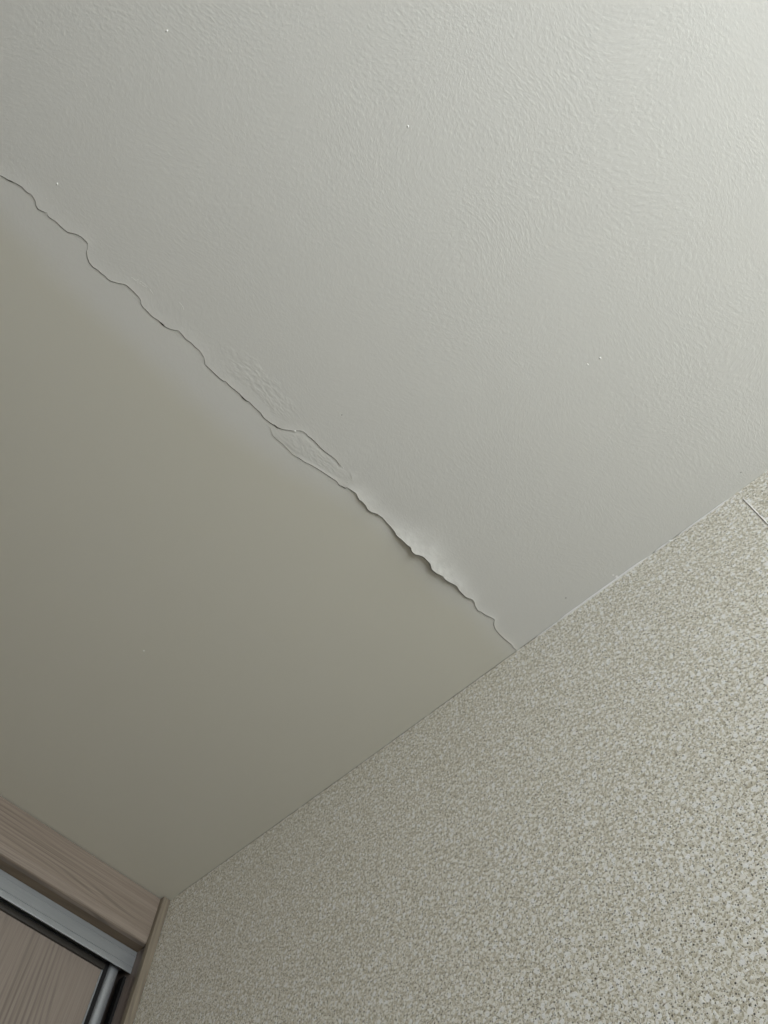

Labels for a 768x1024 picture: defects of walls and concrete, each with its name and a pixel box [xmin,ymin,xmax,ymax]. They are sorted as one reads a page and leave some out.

crack [0,155,349,489]
peeling [346,479,520,650]